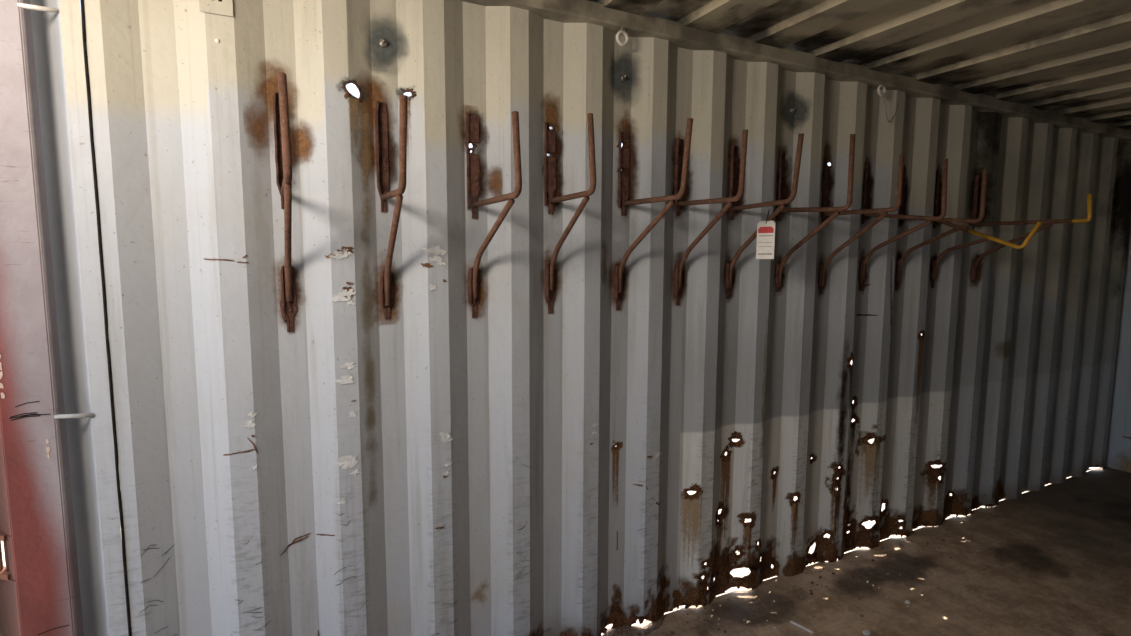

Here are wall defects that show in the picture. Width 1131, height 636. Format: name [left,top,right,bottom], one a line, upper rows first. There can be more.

corrosion [246,65,312,170]
corrosion [339,79,417,183]
corrosion [462,106,502,198]
corrosion [543,99,563,212]
corrosion [616,117,637,212]
corrosion [672,150,692,213]
corrosion [727,138,744,215]
corrosion [375,266,399,321]
corrosion [560,352,1005,636]